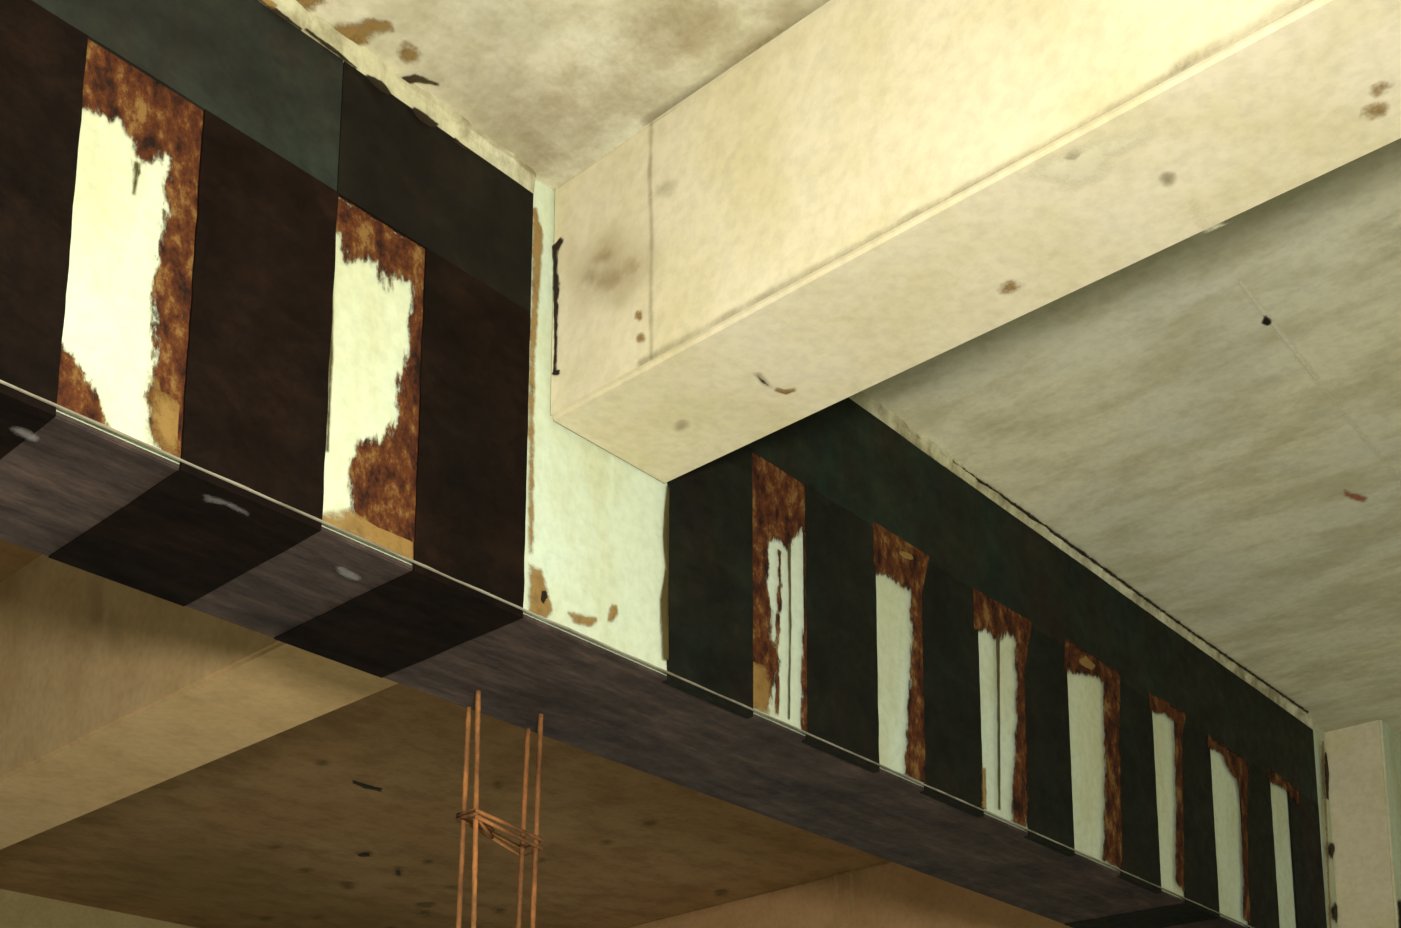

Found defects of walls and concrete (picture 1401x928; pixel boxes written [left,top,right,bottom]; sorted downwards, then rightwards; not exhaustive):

rust [82,39,203,458]
rust [57,343,109,426]
rust [322,198,425,560]
rust [528,208,617,626]
rust [660,487,669,660]
rust [752,452,808,732]
rust [873,522,930,783]
rust [973,588,1032,827]
rust [1064,638,1123,869]
rust [1149,692,1186,891]
rust [1208,736,1251,923]
rust [1268,767,1300,806]